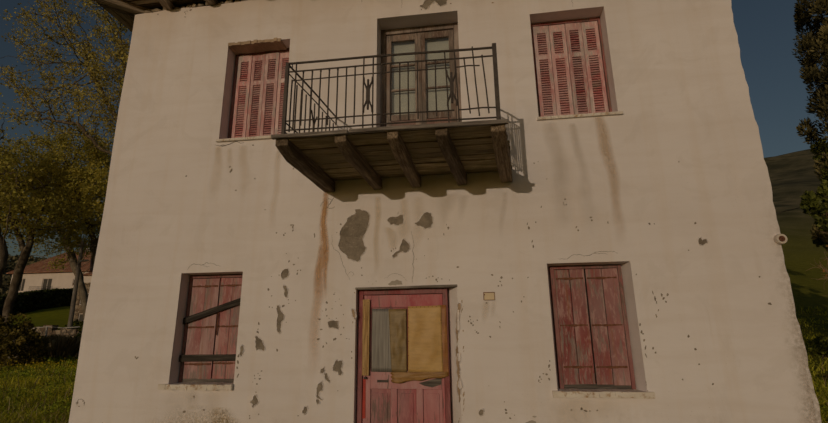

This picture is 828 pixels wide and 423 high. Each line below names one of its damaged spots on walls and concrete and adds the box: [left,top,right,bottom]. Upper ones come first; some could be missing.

peeling [419,0,451,10]
rust [318,194,328,273]
peeling [336,208,371,276]
peeling [391,238,411,259]
peeling [386,211,434,230]
peeling [269,253,301,334]
peeling [254,322,266,352]
spalling [454,300,479,423]